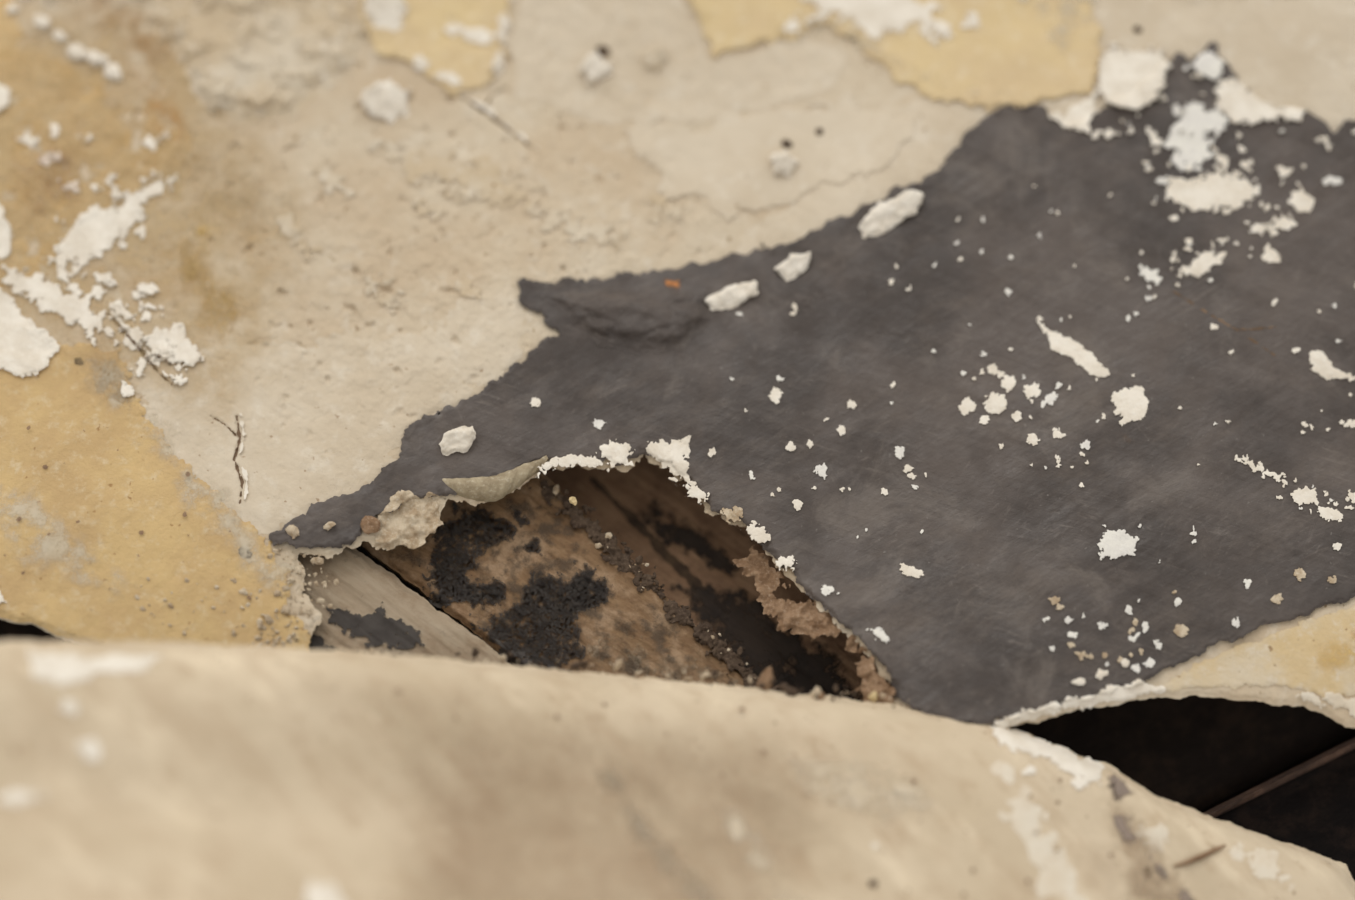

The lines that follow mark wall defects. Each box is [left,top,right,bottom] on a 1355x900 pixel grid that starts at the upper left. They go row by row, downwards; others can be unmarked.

spalling [114,0,410,125]
peeling [444,0,980,222]
peeling [0,123,204,398]
crack [210,413,248,504]
spalling [375,419,710,551]
peeling [769,375,784,404]
peeling [785,439,814,451]
peeling [811,463,827,490]
peeling [894,446,927,490]
peeling [958,351,1071,446]
peeling [1030,440,1090,469]
peeling [0,506,1355,900]